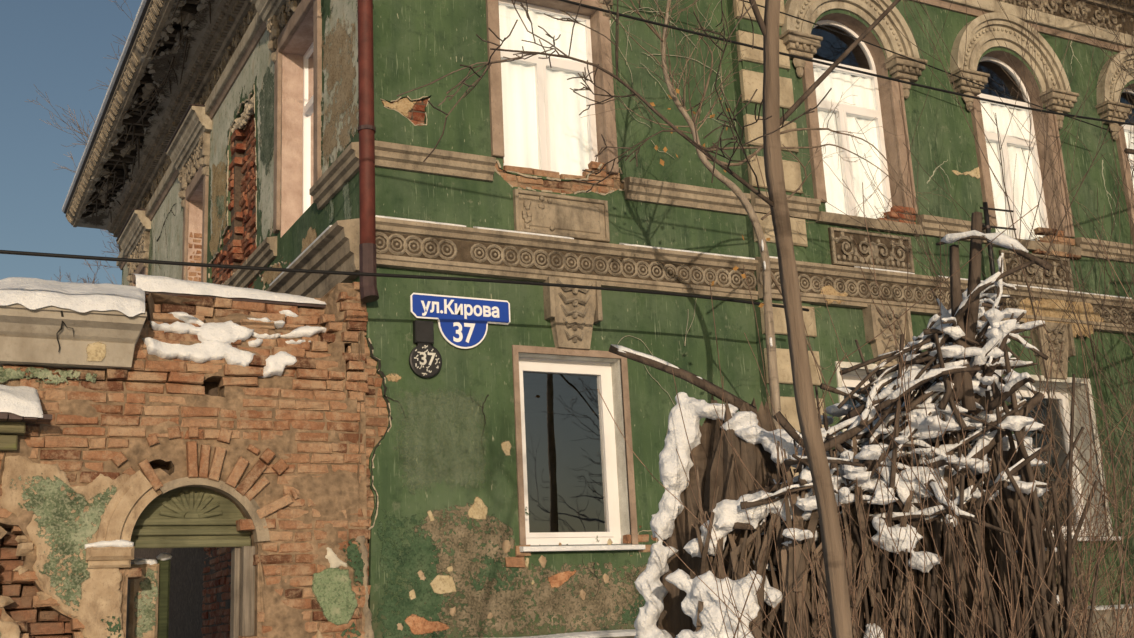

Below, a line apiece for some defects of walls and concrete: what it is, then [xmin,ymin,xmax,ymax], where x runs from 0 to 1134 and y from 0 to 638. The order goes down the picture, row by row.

spalling [75,98,146,220]
spalling [140,0,209,132]
flaking render [208,29,281,285]
flaking render [321,0,359,174]
flaking render [381,96,430,126]
flaking render [247,257,290,291]
flaking render [301,227,317,253]
spalling [0,595,14,608]
spalling [0,526,52,600]
peeling [389,497,647,638]